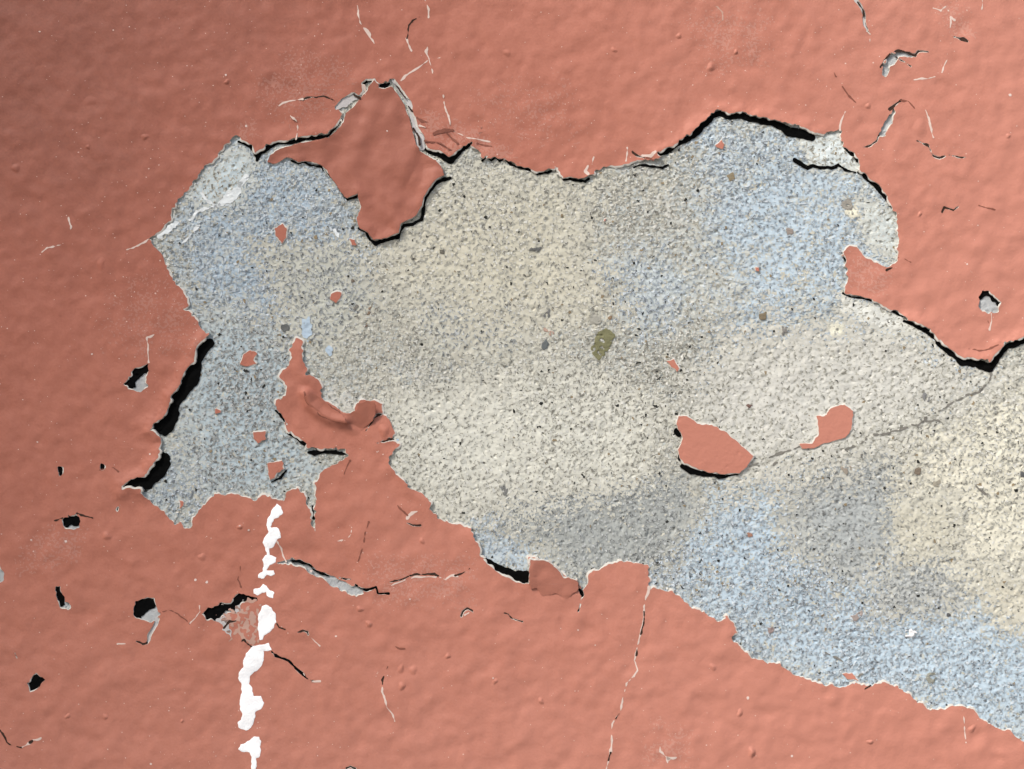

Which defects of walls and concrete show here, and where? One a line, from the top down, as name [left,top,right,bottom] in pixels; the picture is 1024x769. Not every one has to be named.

spalling [882,49,929,77]
peeling [122,78,1024,742]
spalling [62,514,80,530]
crack [276,541,470,595]
spalling [55,586,71,610]
hole [27,673,45,692]
crack [223,620,321,683]
crack [606,586,650,769]